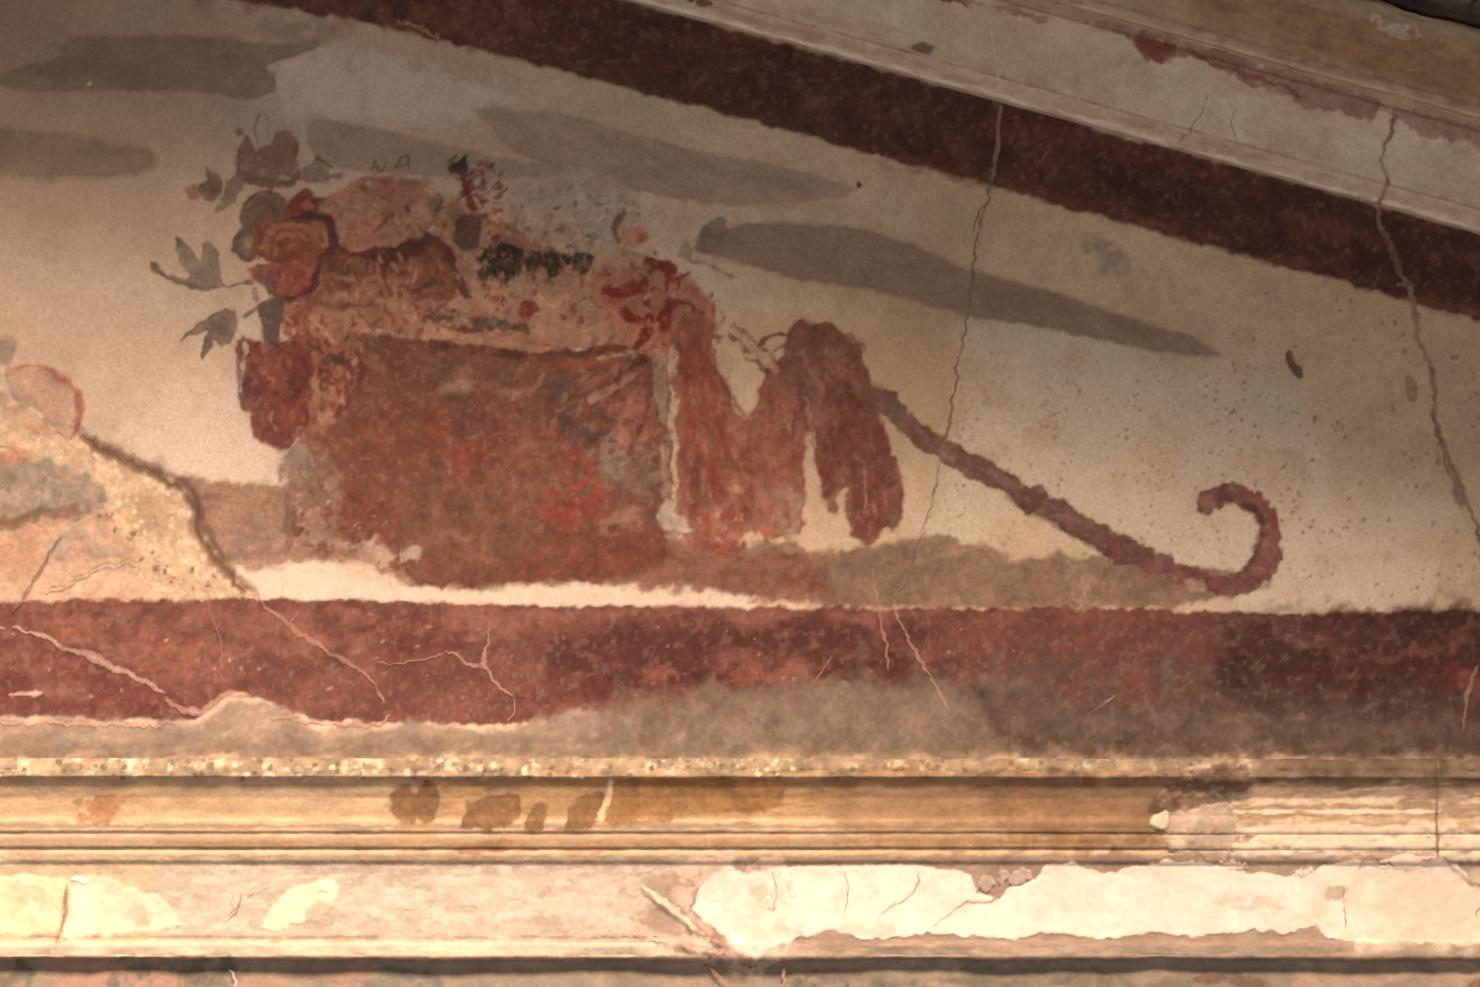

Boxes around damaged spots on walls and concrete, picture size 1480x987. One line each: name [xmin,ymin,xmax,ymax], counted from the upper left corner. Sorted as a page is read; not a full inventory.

crack [874,105,1002,705]
crack [1378,116,1480,543]
damp [0,676,1480,854]
crack [1462,668,1477,728]
peeling [0,860,180,940]
peeling [693,855,1480,961]